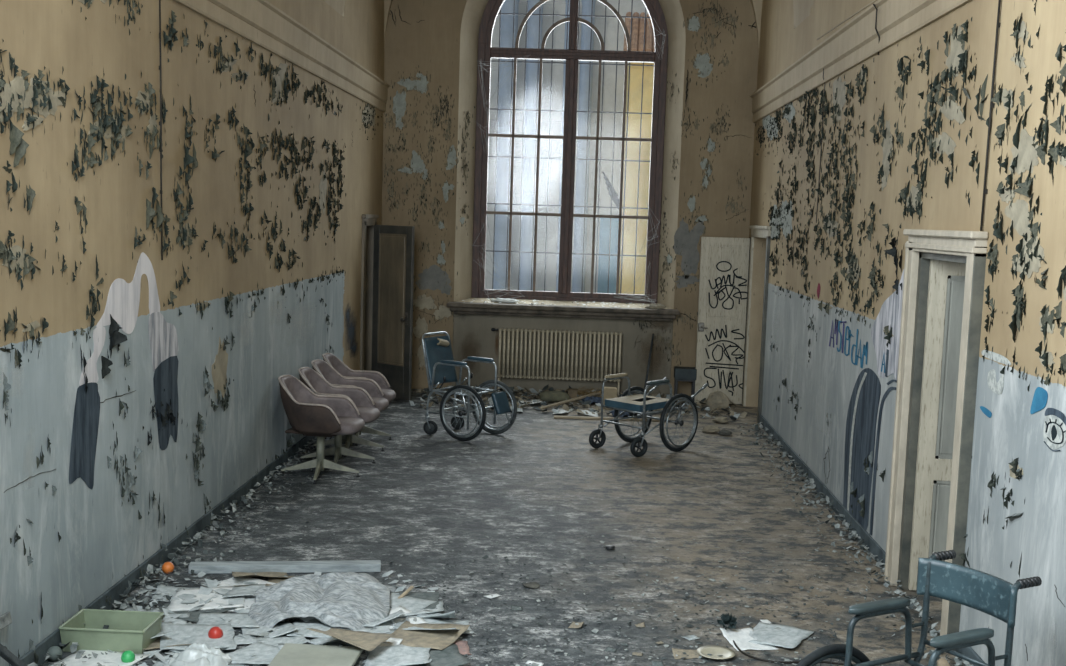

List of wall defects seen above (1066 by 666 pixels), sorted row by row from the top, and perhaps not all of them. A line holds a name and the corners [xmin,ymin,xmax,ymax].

peeling [72,0,143,35]
peeling [683,0,742,88]
peeling [0,10,346,331]
peeling [659,74,731,300]
peeling [755,0,1066,392]
peeling [0,196,317,666]
peeling [776,379,799,420]
peeling [316,628,375,666]
peeling [370,621,390,632]
peeling [382,571,442,599]